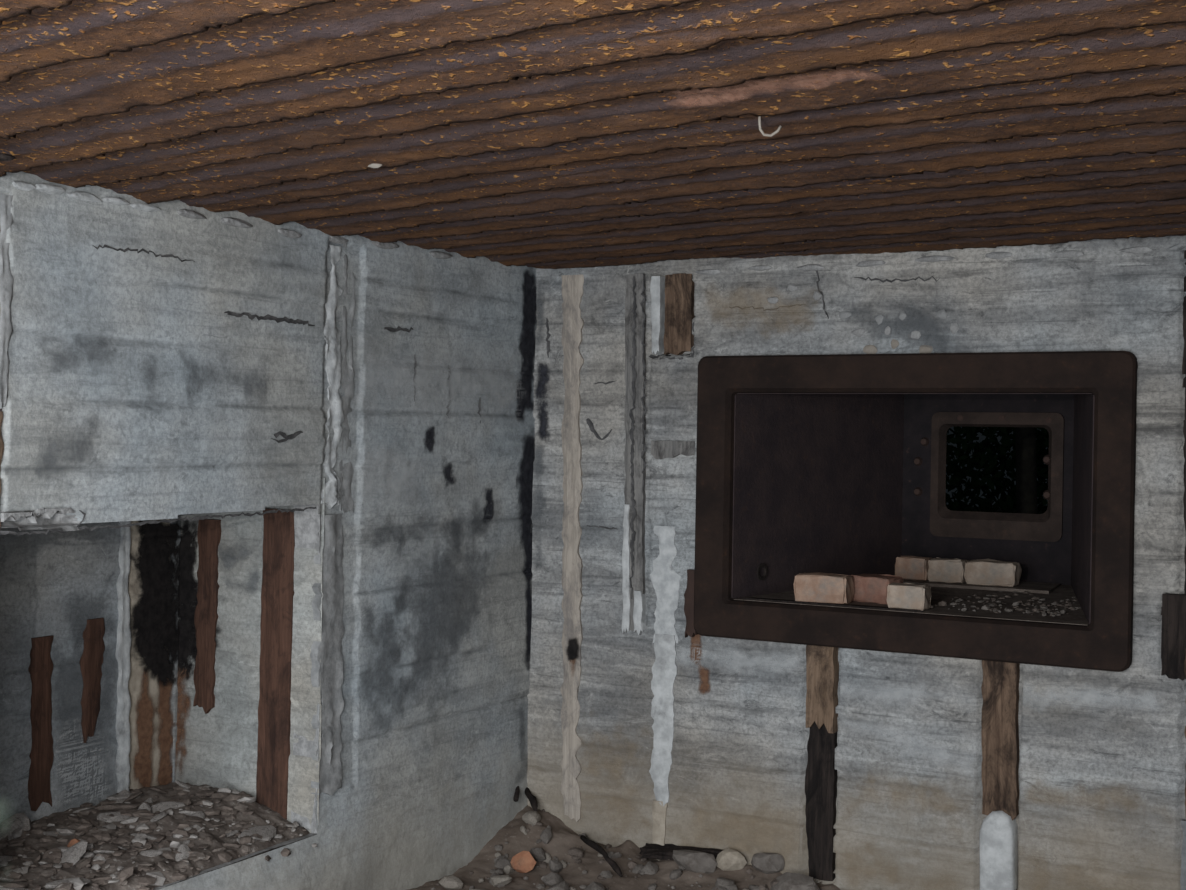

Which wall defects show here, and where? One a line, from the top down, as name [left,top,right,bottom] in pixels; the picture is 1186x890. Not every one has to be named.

crack [92,244,193,262]
crack [224,311,315,326]
water stain [425,427,434,451]
water stain [443,464,454,486]
water stain [364,489,494,690]